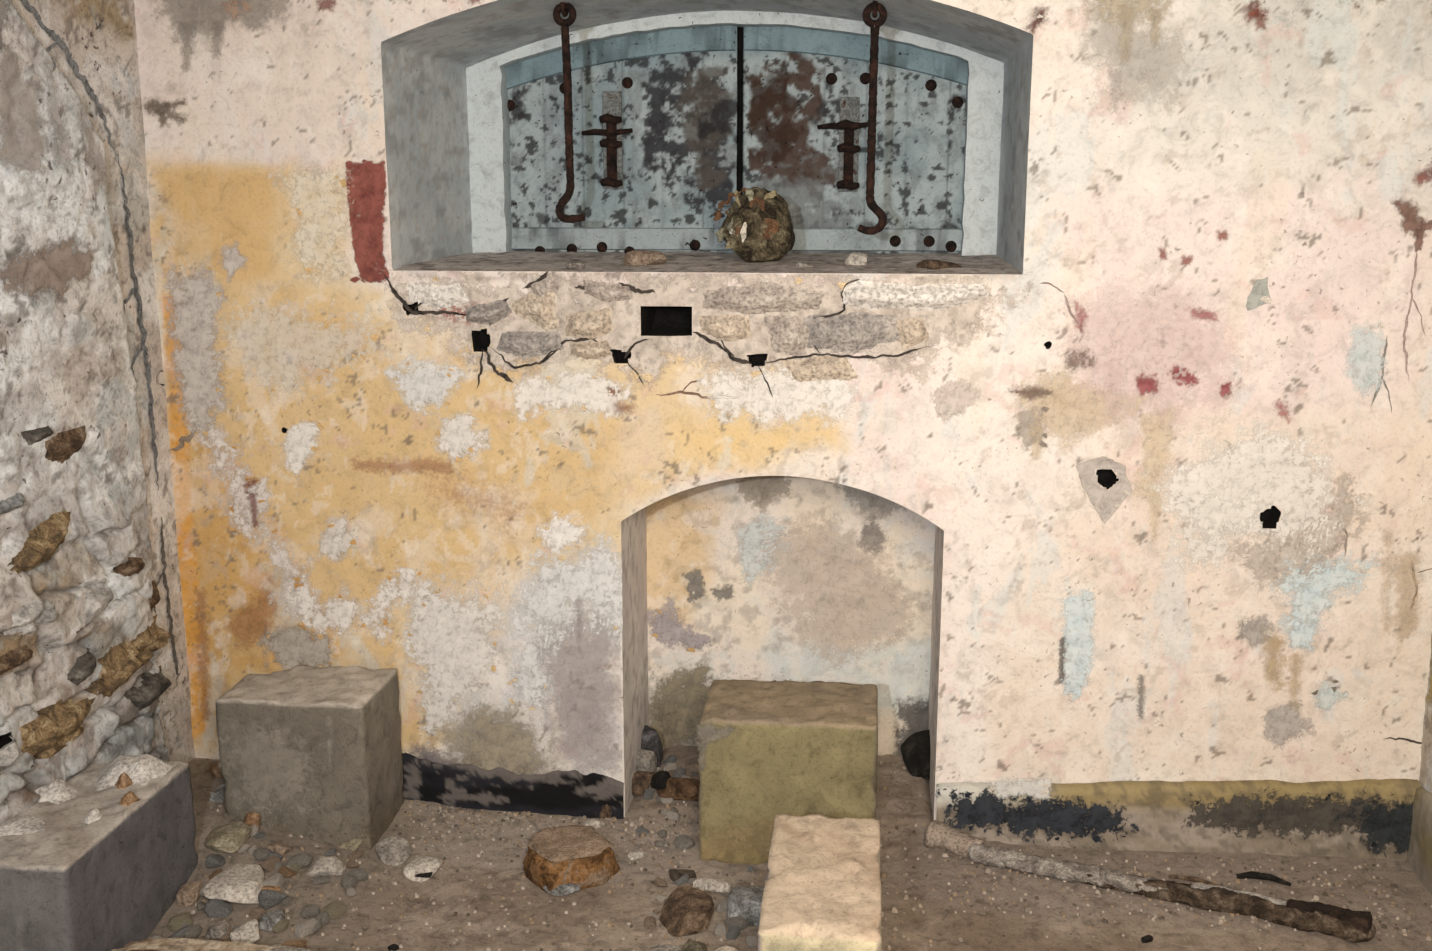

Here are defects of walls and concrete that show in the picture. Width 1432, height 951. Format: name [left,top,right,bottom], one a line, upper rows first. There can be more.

crack [384,271,933,399]
spalling [156,159,1017,745]
spalling [1076,456,1133,523]
spalling [0,731,14,749]
crack [1386,736,1422,744]